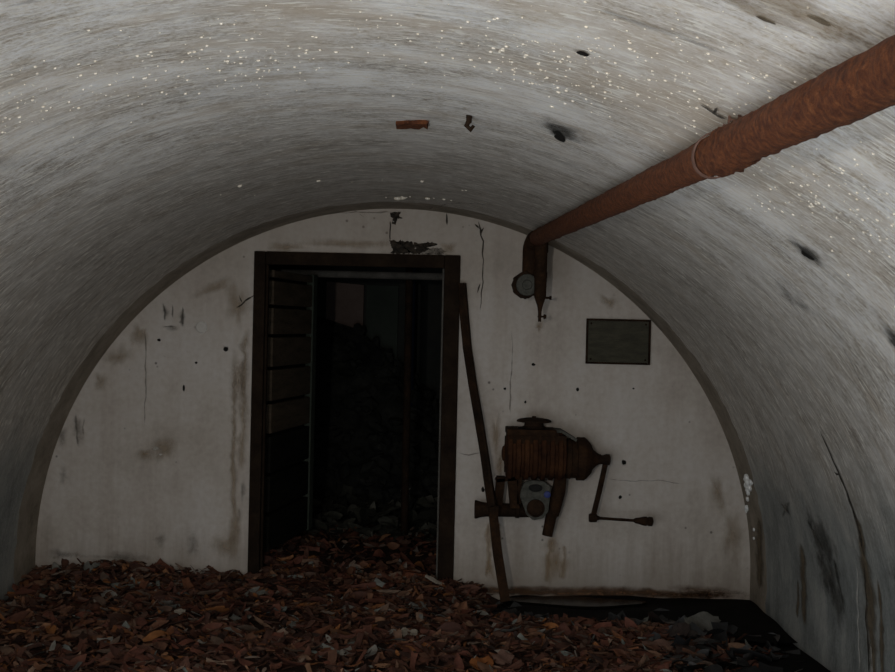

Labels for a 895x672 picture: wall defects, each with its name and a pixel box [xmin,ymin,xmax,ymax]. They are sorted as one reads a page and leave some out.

damp [743,474,753,513]
crack [821,435,869,672]